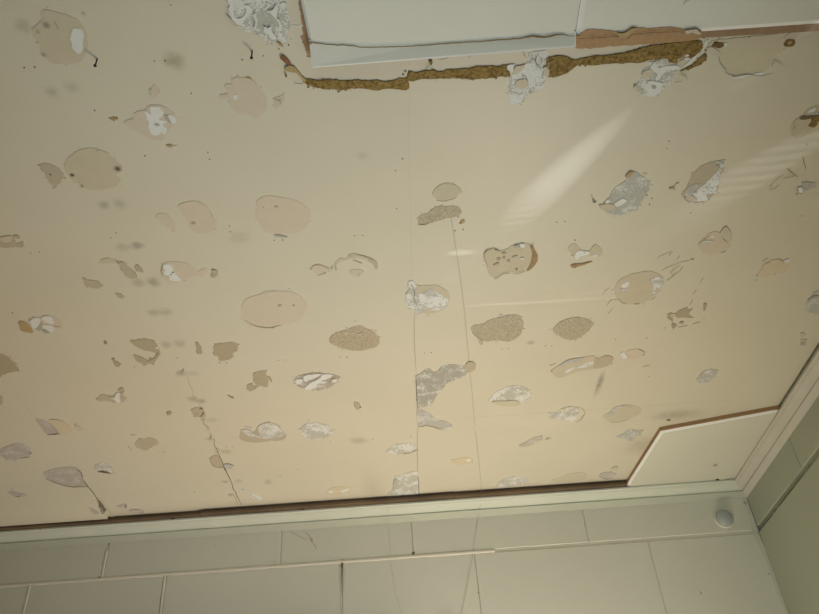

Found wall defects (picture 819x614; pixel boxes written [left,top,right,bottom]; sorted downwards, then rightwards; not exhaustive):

peeling [32,6,88,66]
peeling [227,0,286,40]
peeling [646,54,689,97]
peeling [109,84,181,148]
peeling [669,159,726,204]
peeling [483,243,538,279]
peeling [329,325,380,352]
peeling [471,314,525,345]
crack [182,369,240,504]